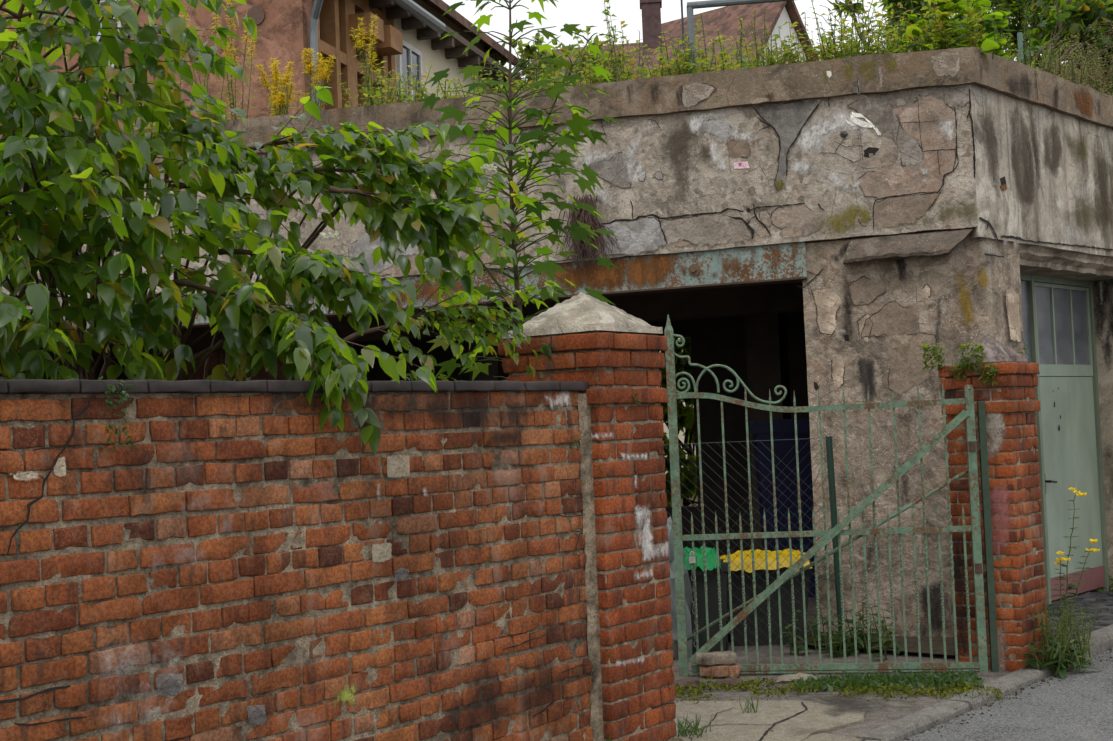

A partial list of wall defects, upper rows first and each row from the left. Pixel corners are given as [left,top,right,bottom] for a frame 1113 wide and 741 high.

crack [729,98,830,177]
crack [821,139,863,163]
crack [858,89,976,230]
damp [973,74,1111,243]
crack [593,201,824,244]
rust [555,253,686,290]
damp [1094,279,1113,362]